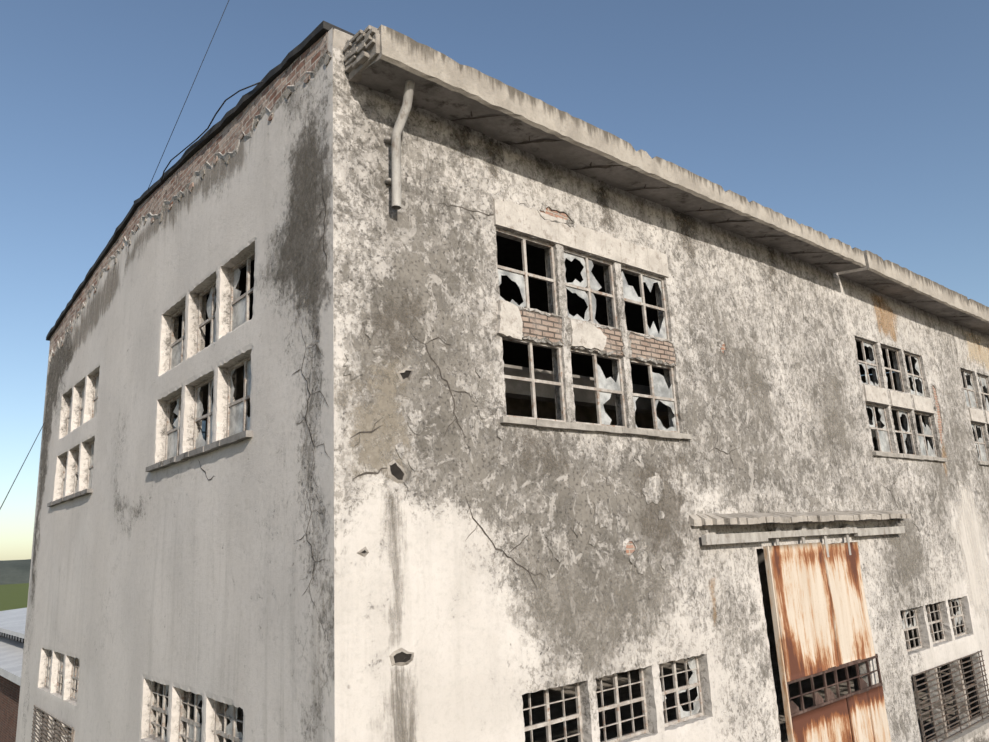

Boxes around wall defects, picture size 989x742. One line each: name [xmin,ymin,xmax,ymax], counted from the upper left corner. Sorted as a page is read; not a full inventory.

leakage [456,127,502,178]
leakage [274,121,333,338]
leakage [594,187,613,228]
leakage [672,209,697,259]
flaking render [518,307,677,366]
leakage [344,295,426,479]
crack [411,333,474,448]
leakage [514,434,568,473]
leakage [636,457,687,559]